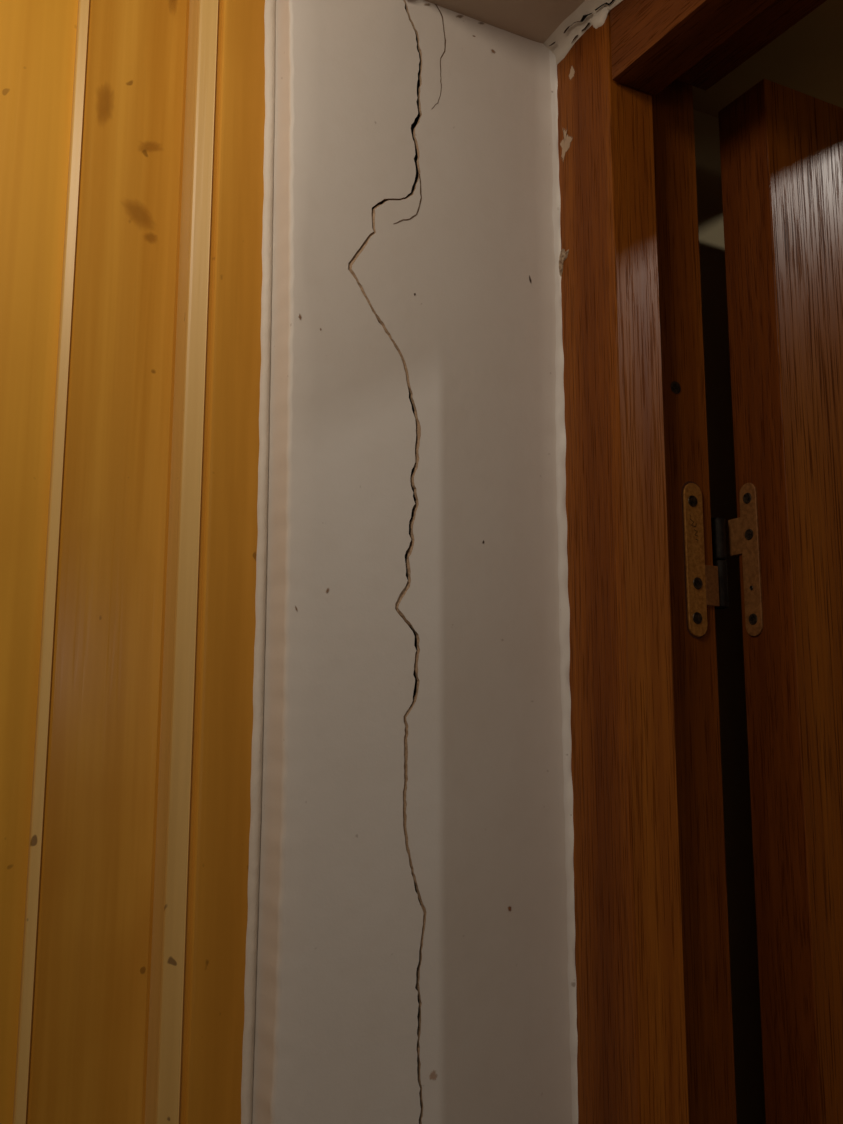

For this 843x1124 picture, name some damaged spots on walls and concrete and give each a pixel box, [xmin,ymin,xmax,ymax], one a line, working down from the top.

crack [348,0,446,1124]